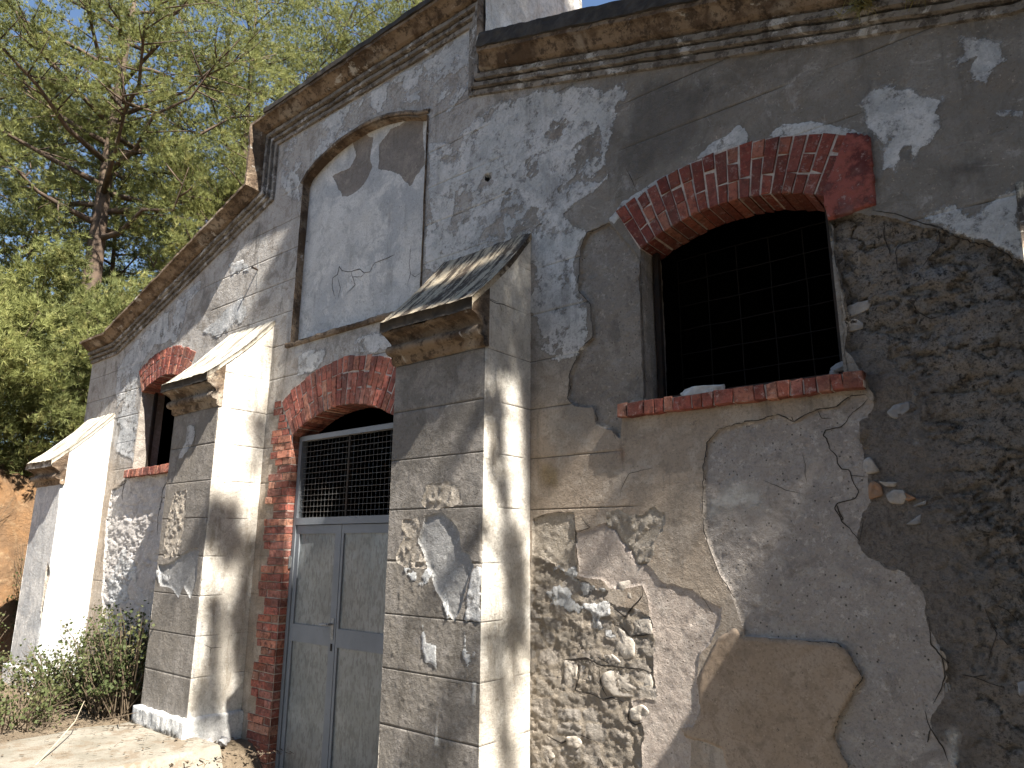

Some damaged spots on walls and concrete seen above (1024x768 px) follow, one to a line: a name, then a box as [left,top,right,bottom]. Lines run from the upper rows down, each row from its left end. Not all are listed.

crack [332,250,420,297]
peeling [280,30,748,438]
peeling [769,84,943,171]
peeling [949,35,1007,84]
spalling [101,475,202,696]
spalling [396,481,482,670]
spalling [530,506,722,768]
crack [697,395,866,614]
spalling [702,190,1024,768]
crack [925,604,1015,760]